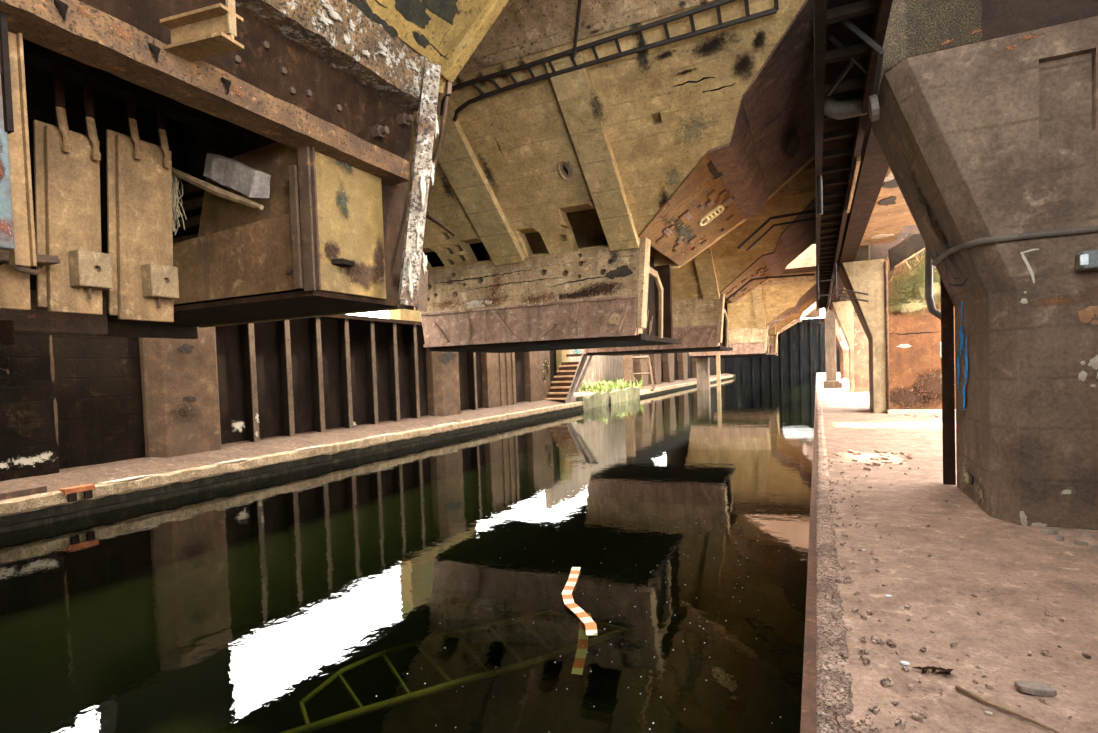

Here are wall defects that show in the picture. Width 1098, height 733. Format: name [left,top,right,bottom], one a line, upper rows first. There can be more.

peeling [315,0,419,92]
peeling [395,0,458,48]
peeling [420,161,435,206]
corrosion [319,239,385,289]
peeling [408,219,427,300]
spalling [606,265,633,279]
spalling [466,299,492,309]
spalling [1077,306,1098,325]
spalling [1078,355,1098,387]
leakage [0,452,53,468]